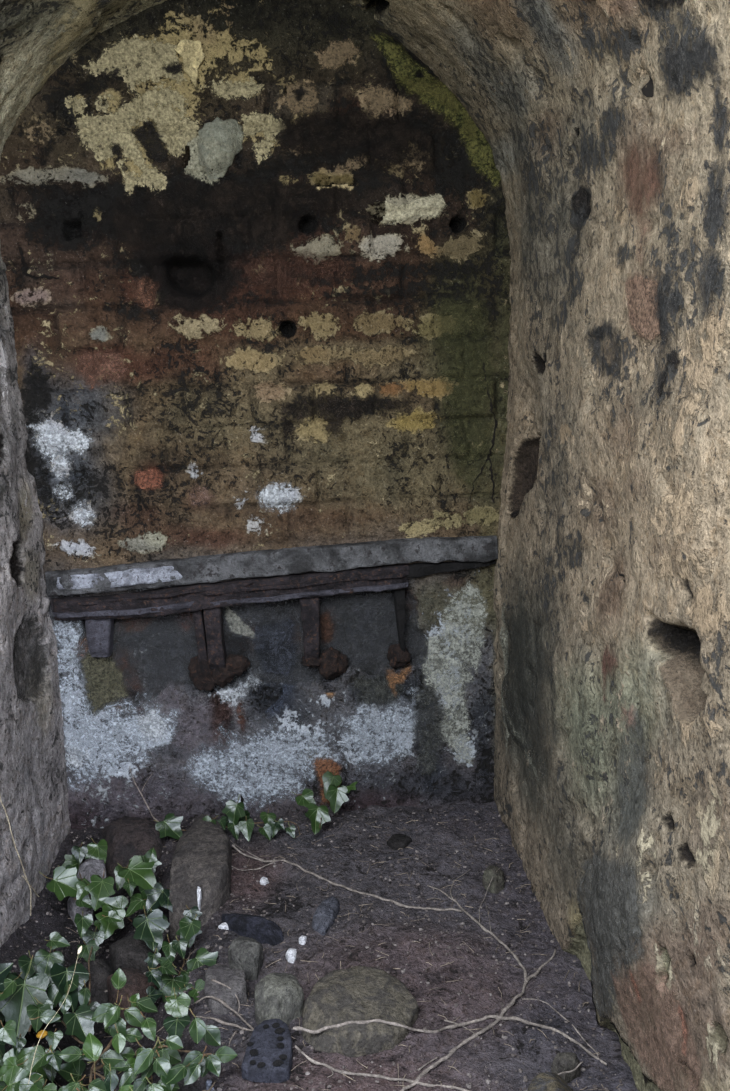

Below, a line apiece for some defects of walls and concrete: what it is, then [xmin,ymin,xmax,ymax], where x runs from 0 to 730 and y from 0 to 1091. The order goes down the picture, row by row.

flaking render [319,39,360,70]
flaking render [64,34,319,195]
flaking render [363,84,414,118]
flaking render [381,194,446,225]
water stain [30,424,90,498]
spalling [509,437,541,518]
water stain [74,507,92,525]
water stain [53,621,177,787]
water stain [188,581,487,810]
corrosion [387,665,411,693]
spalling [648,619,707,722]